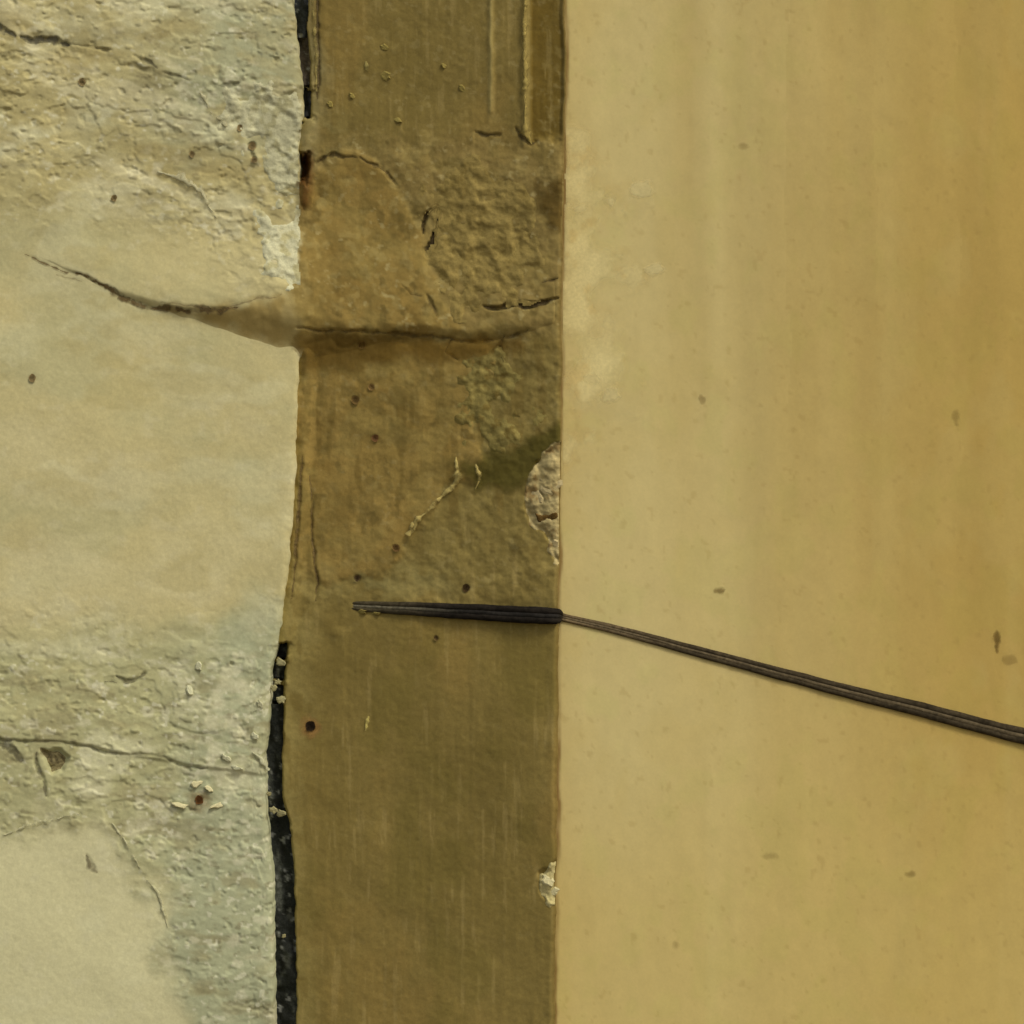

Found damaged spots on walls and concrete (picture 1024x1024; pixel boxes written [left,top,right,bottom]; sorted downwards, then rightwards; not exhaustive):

crack [318,153,392,179]
crack [422,206,438,251]
crack [25,254,238,315]
crack [483,278,558,310]
flaking render [563,130,621,402]
spalling [524,441,573,565]
crack [0,743,47,797]
crack [266,643,297,1024]
spalling [539,862,560,908]